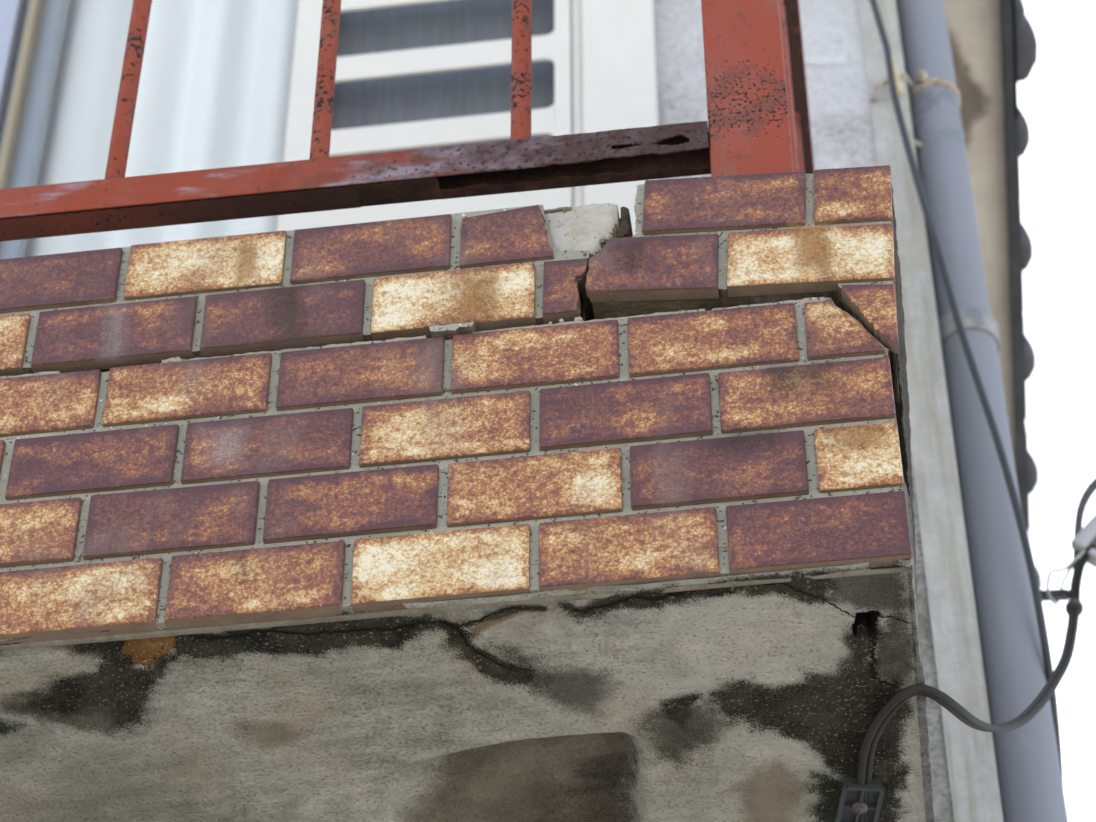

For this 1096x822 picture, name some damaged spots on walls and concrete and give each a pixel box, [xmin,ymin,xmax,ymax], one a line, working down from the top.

damp [948,30,989,145]
spalling [544,203,633,257]
rust [799,227,828,270]
crack [161,356,183,364]
crack [429,322,476,340]
crack [549,286,734,324]
crack [889,352,910,494]
crack [180,588,716,673]
crack [763,583,912,690]
damp [0,560,918,822]